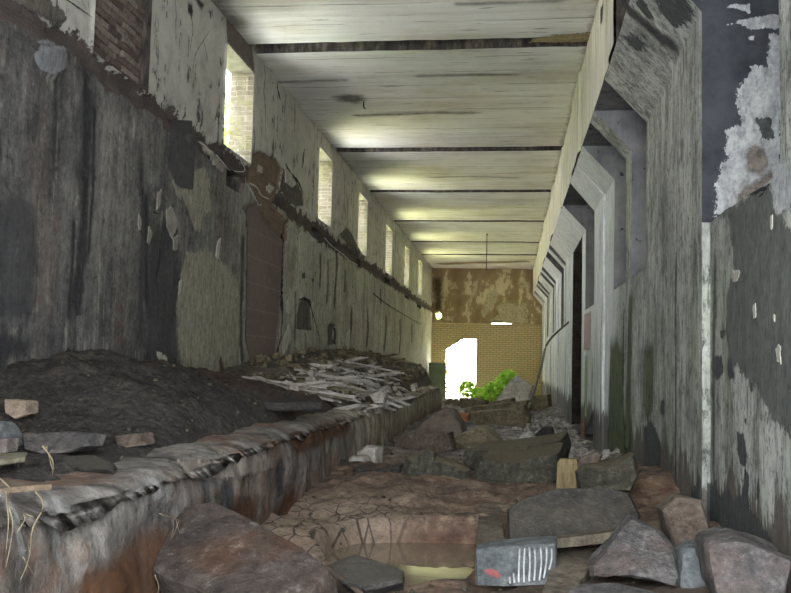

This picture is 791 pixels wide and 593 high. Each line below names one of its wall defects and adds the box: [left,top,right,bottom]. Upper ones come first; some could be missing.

spalling [10,0,67,30]
spalling [226,18,255,71]
damp [0,194,37,315]
damp [68,70,95,351]
peeling [137,214,153,244]
damp [139,155,180,365]
peeling [156,141,319,372]
peeling [711,3,791,439]
damp [0,327,30,372]
damp [622,296,632,451]
damp [643,347,653,419]
peeling [691,418,773,544]